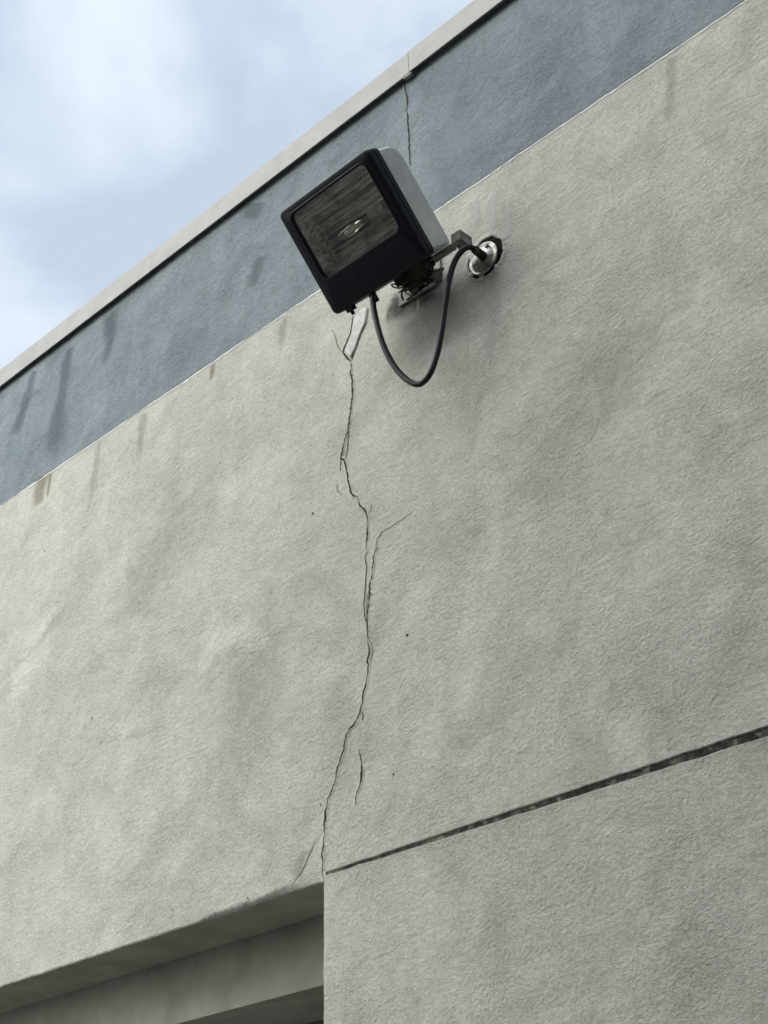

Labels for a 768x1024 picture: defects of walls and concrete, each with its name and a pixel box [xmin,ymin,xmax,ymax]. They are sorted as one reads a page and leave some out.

crack [403,82,412,166]
crack [294,308,413,883]